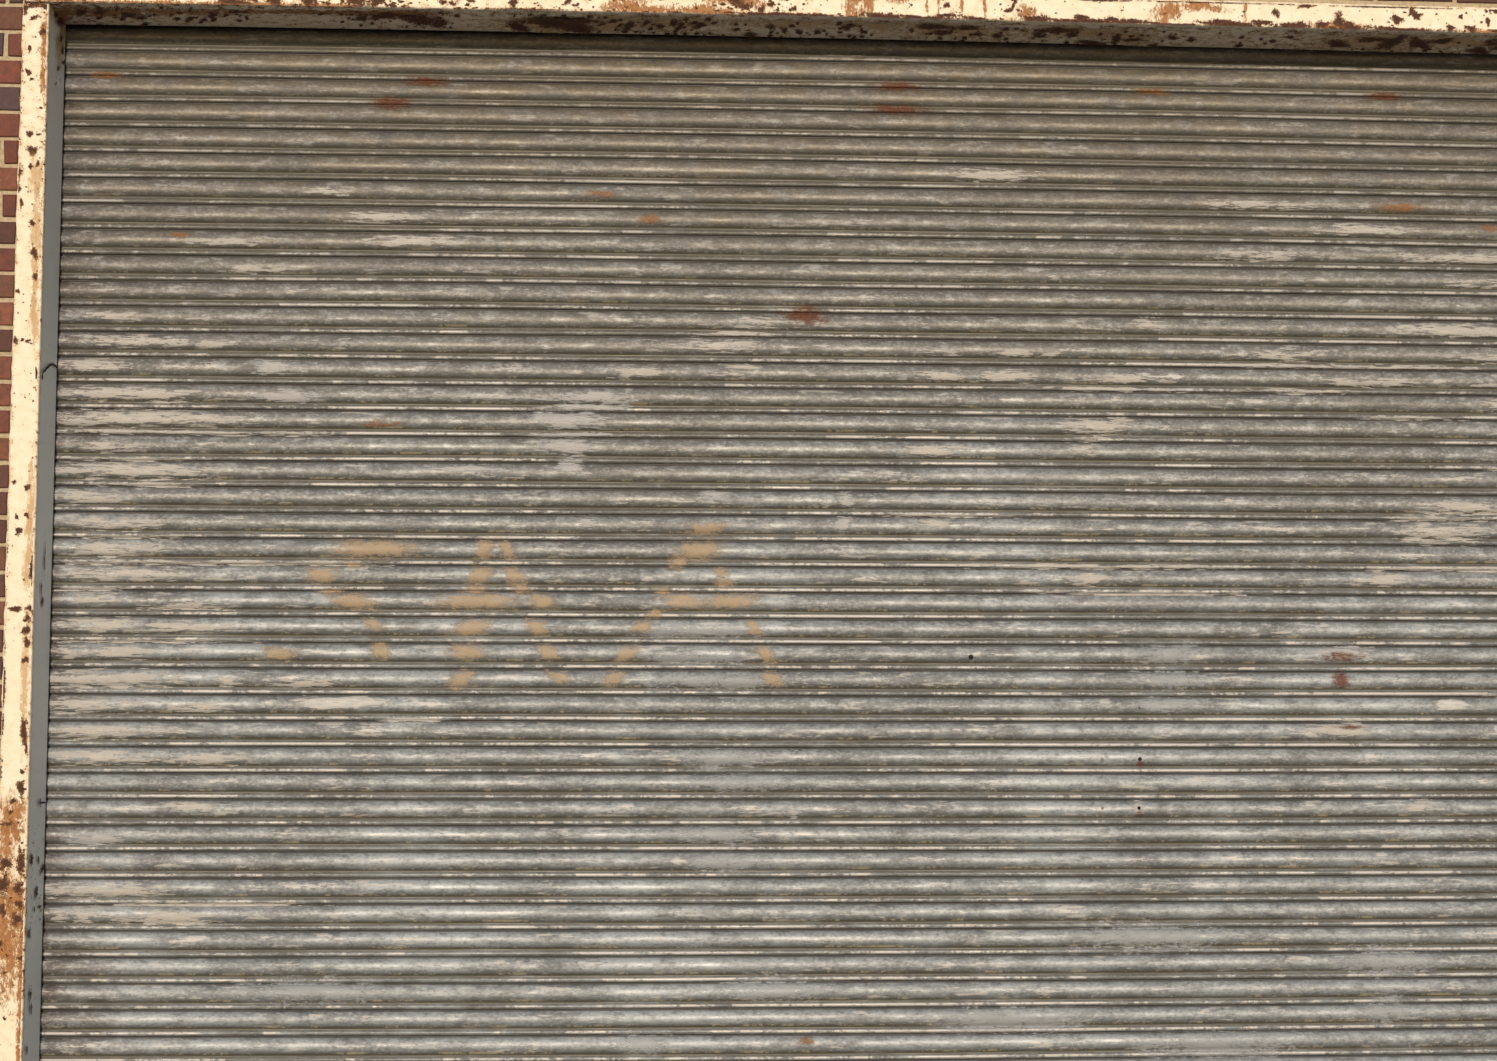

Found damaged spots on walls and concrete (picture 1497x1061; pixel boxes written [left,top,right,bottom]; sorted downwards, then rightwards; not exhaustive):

rust [35,0,1497,113]
peeling [904,0,1497,55]
peeling [13,0,478,344]
peeling [1201,199,1497,289]
peeling [408,364,668,475]
peeling [662,314,802,369]
rust [785,306,828,324]
peeling [901,348,1187,393]
peeling [1220,323,1497,422]
peeling [0,311,394,1014]
rust [1326,652,1357,688]
rust [0,798,26,1061]